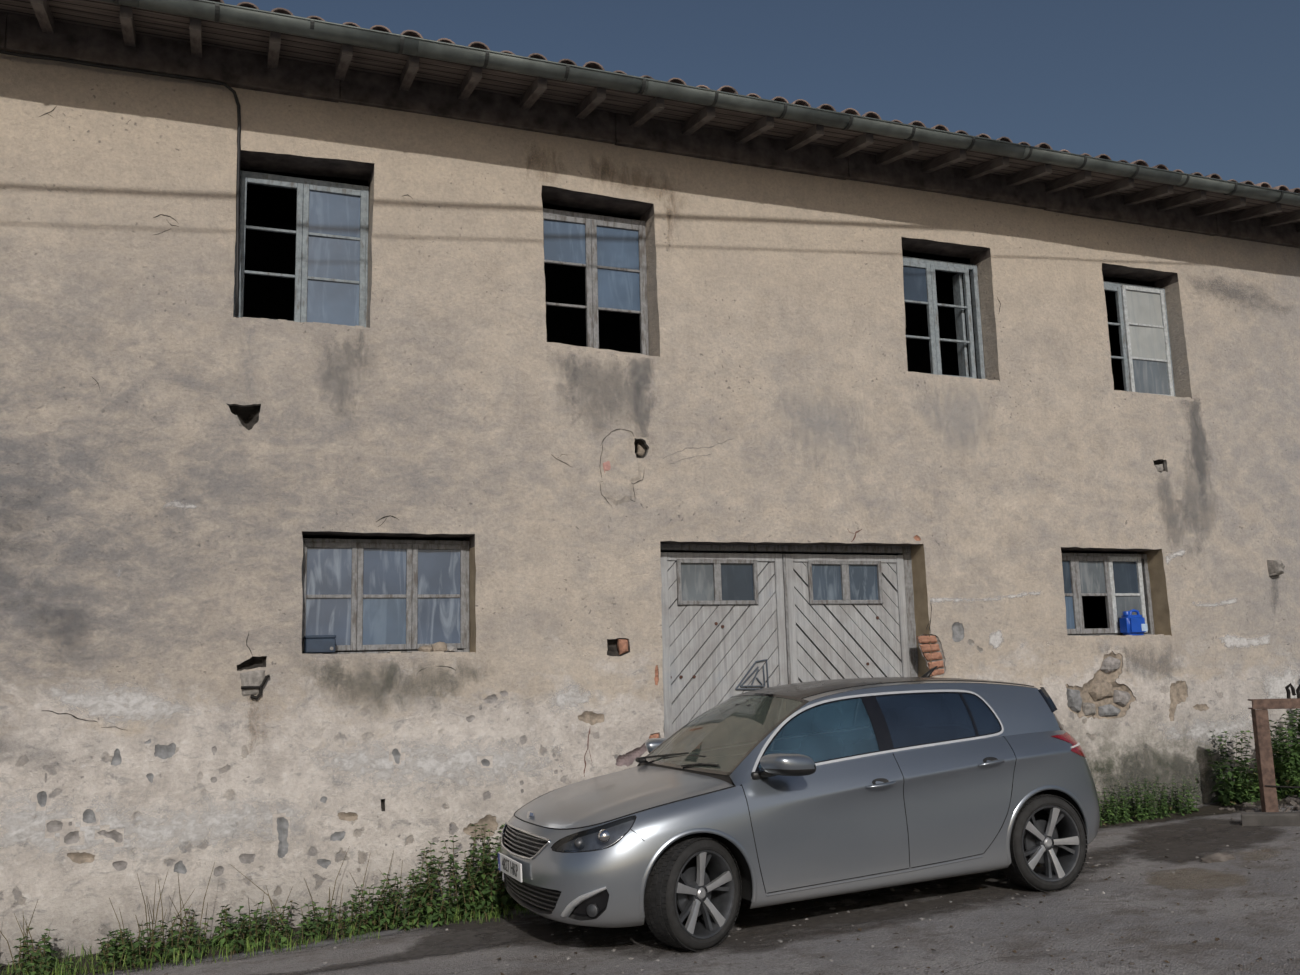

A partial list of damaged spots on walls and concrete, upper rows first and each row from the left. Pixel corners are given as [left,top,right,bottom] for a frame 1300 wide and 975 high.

flaking render [916,622,1003,677]
spalling [1065,651,1136,720]
peeling [1264,668,1300,699]
crack [47,710,124,730]
peeling [1165,681,1253,742]
spalling [616,732,661,767]
spalling [463,814,498,841]